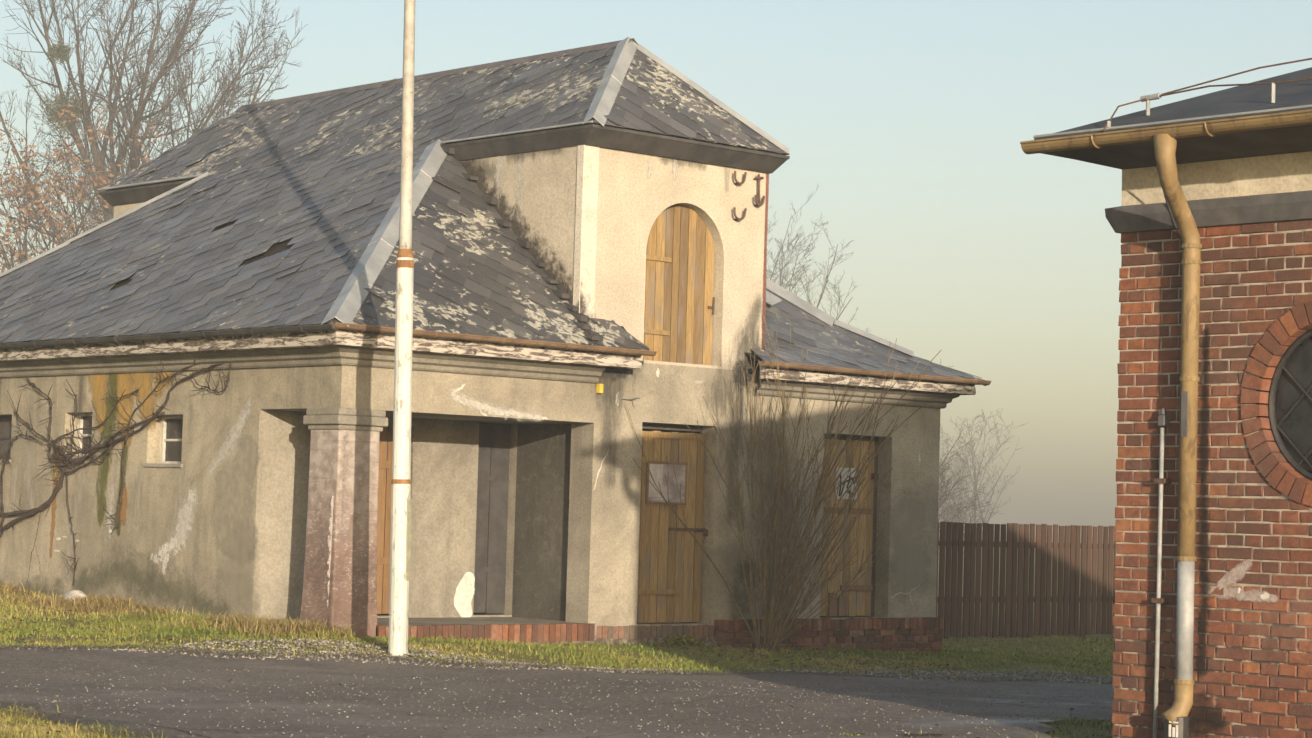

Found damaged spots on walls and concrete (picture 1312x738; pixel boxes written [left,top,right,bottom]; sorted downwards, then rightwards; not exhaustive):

peeling [207,402,251,474]
water stain [25,374,224,616]
peeling [150,489,198,575]
spalling [454,572,475,617]